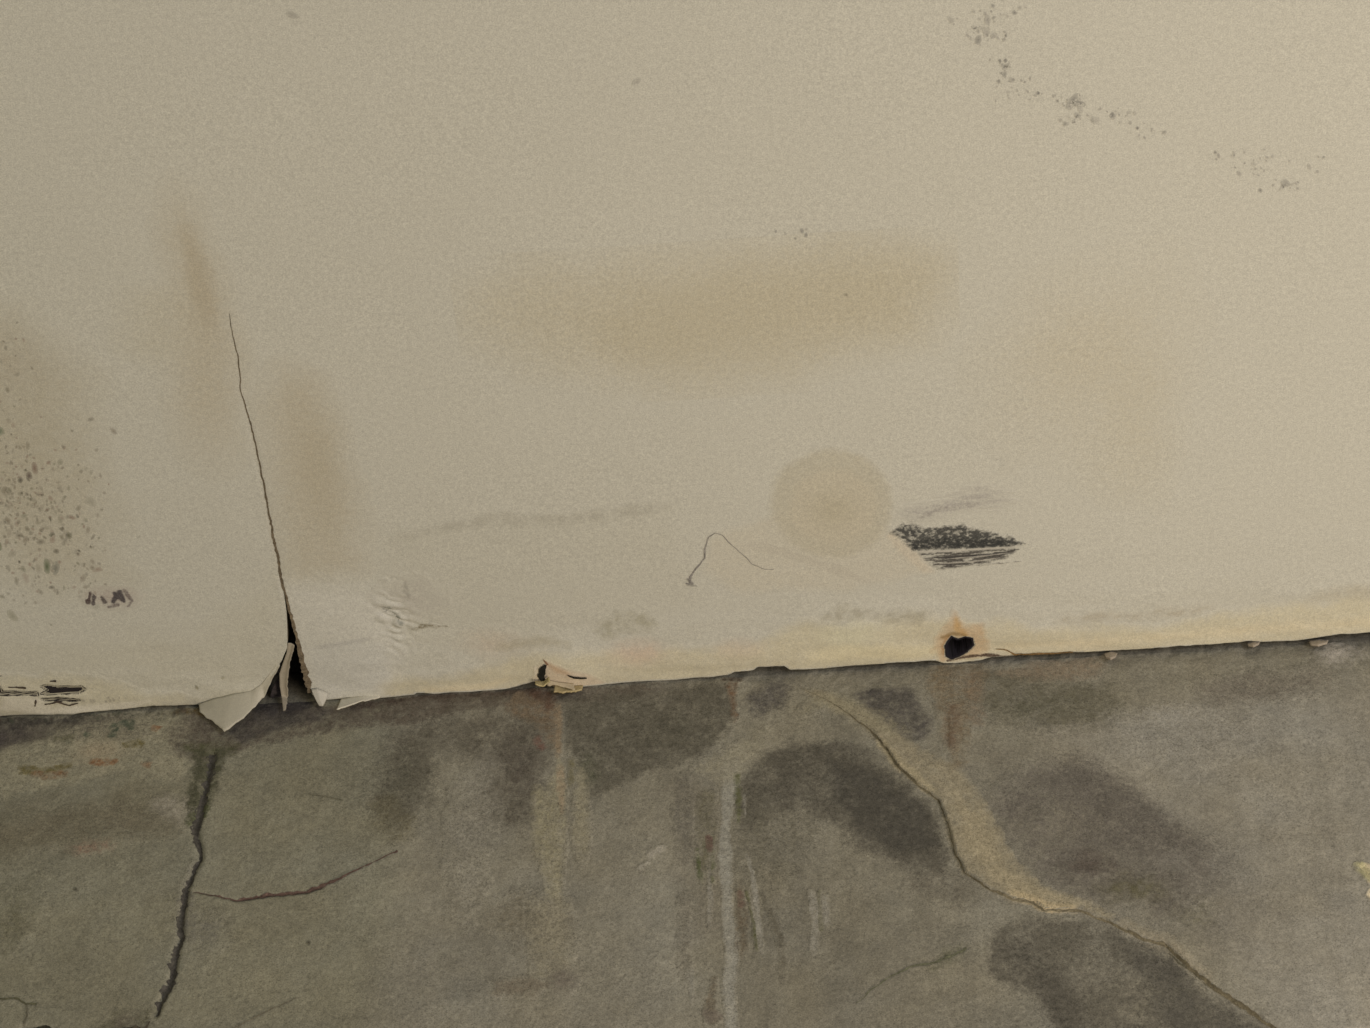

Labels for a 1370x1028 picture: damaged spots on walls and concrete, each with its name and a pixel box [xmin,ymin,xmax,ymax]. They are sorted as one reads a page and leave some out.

mould [947,0,1167,139]
mould [1214,149,1325,193]
damp [449,226,960,403]
damp [0,166,681,626]
crack [229,314,312,711]
damp [697,445,1023,597]
peeling [311,688,380,710]
crack [89,747,398,1028]
damp [0,598,1370,1028]
crack [0,997,51,1028]
crack [858,947,967,1002]